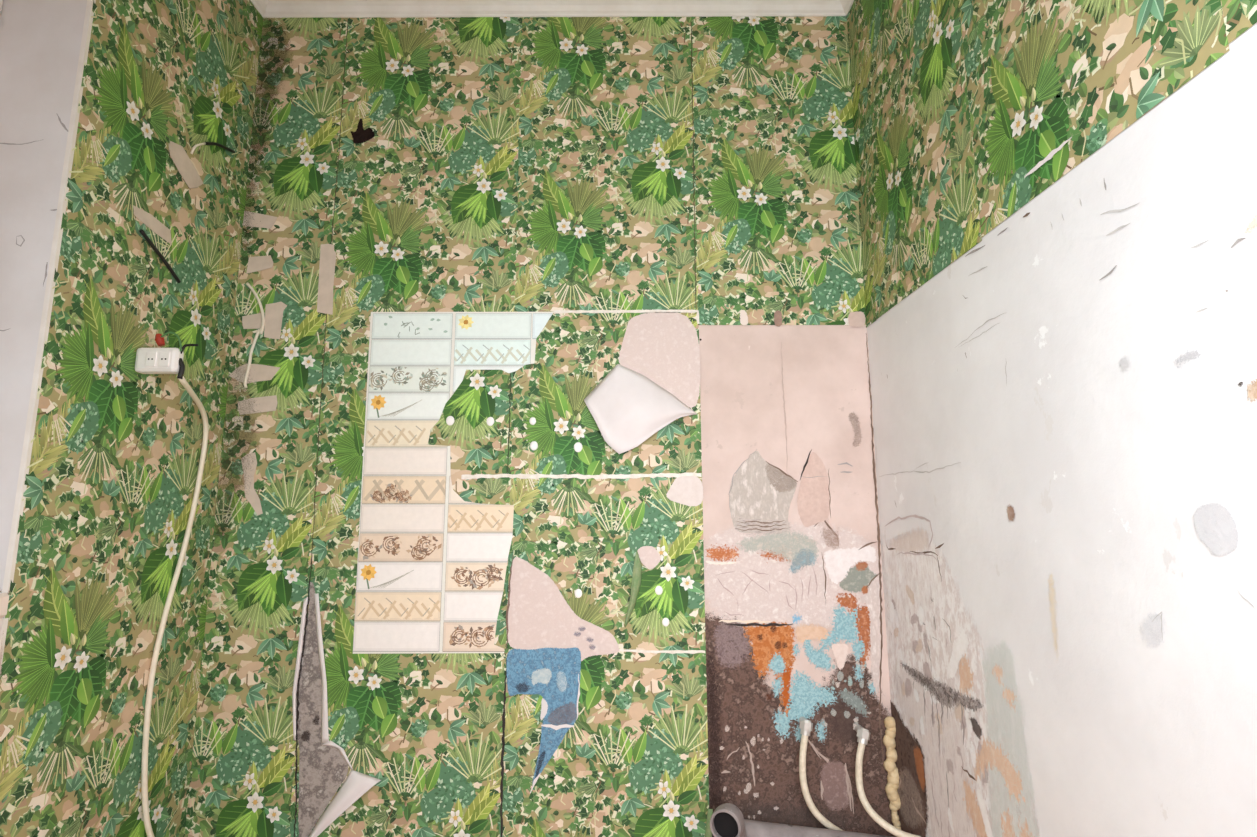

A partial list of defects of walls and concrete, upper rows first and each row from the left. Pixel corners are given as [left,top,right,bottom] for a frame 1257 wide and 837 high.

hole [351,118,375,144]
peeling [767,521,1045,837]